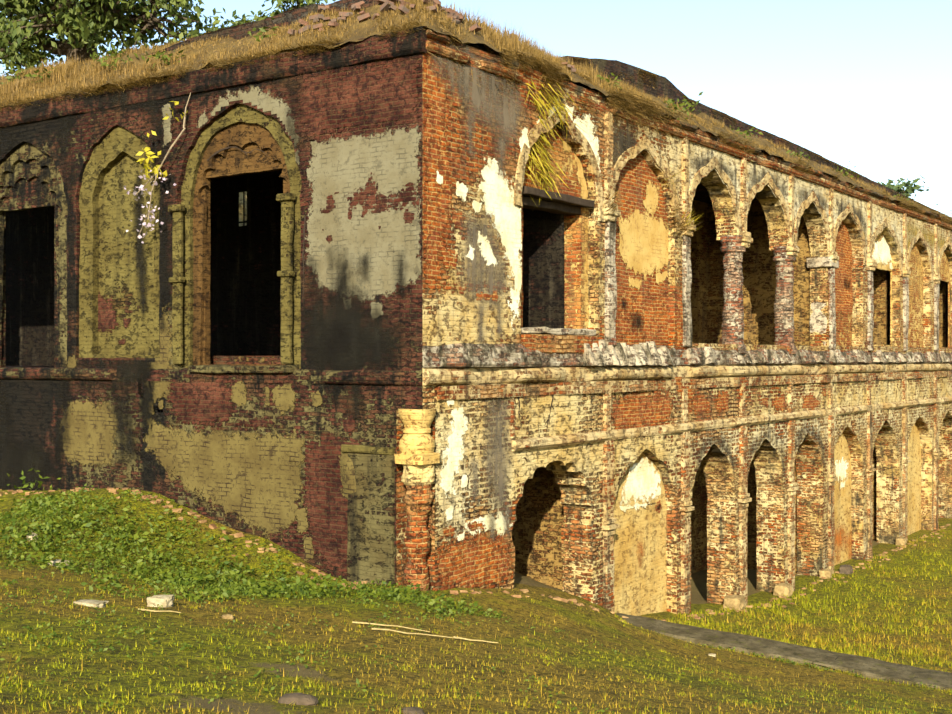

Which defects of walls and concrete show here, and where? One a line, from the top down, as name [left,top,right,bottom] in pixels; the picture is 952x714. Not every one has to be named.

peeling [162,103,172,147]
peeling [197,55,522,330]
leakage [159,211,173,302]
peeling [616,180,687,357]
leakage [0,380,68,491]
leakage [84,360,153,457]
peeling [142,373,364,575]
peeling [762,394,787,413]
peeling [799,388,826,411]
peeling [432,521,514,589]